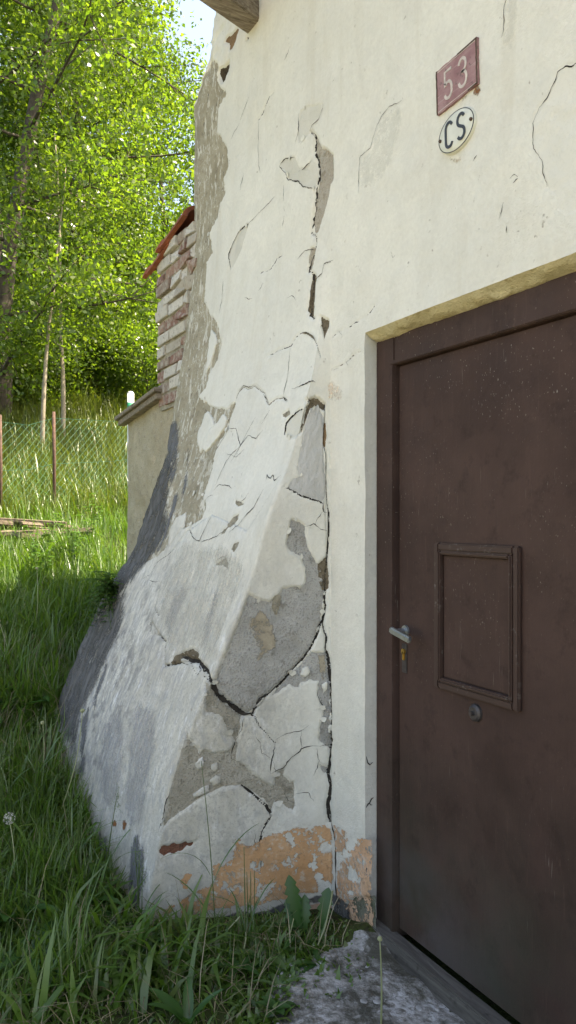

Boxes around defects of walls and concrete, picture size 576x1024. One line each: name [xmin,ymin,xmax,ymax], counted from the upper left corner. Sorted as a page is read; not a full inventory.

spalling [226,29,249,50]
spalling [280,104,334,233]
crack [499,63,576,230]
flaking render [133,60,235,564]
spalling [308,247,329,338]
spalling [221,500,243,535]
crack [150,96,375,903]
peeling [283,398,327,502]
flaking render [160,518,333,827]
peeling [159,825,376,929]